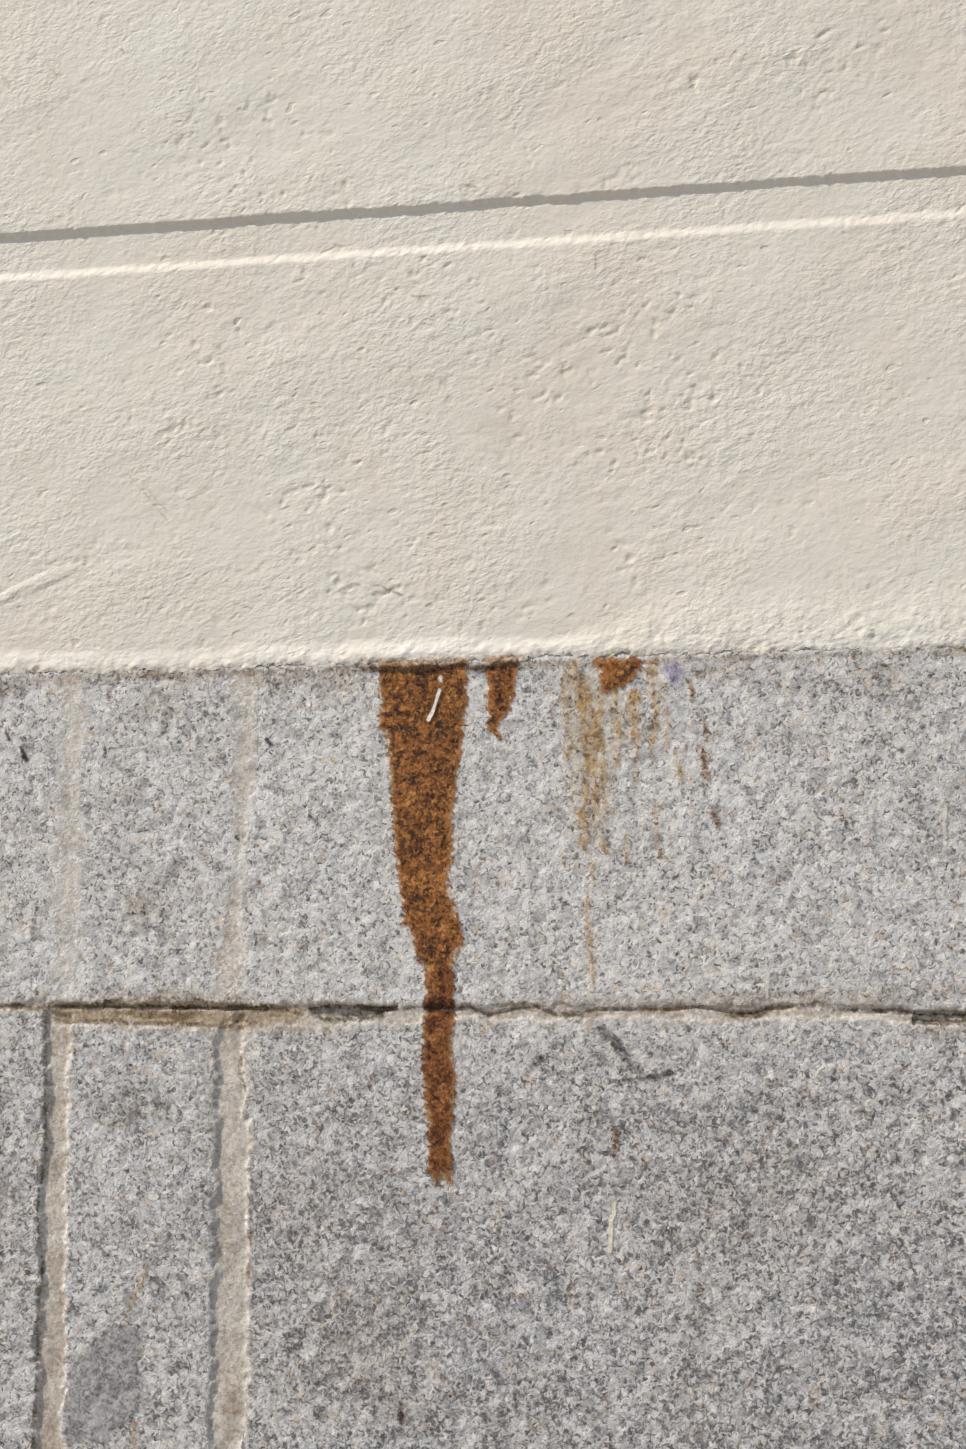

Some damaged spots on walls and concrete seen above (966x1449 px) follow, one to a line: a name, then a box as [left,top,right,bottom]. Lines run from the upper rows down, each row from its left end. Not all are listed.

crack [0,997,300,1445]
rust [355,654,522,1188]
crack [395,1001,915,1019]